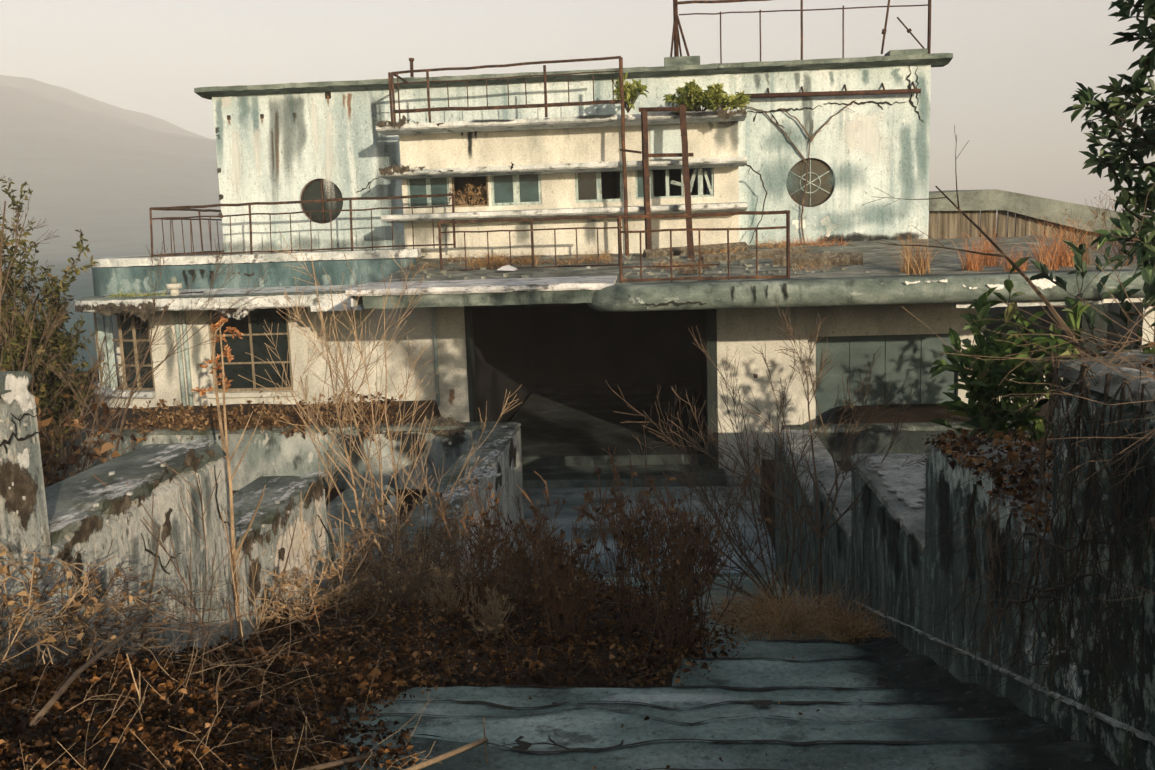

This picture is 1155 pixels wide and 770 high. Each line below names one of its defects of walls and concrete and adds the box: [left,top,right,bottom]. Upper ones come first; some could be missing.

water stain [820,232,919,242]
flaking render [0,374,36,430]
crack [0,413,40,453]
water stain [937,477,1005,602]
crack [488,734,571,752]